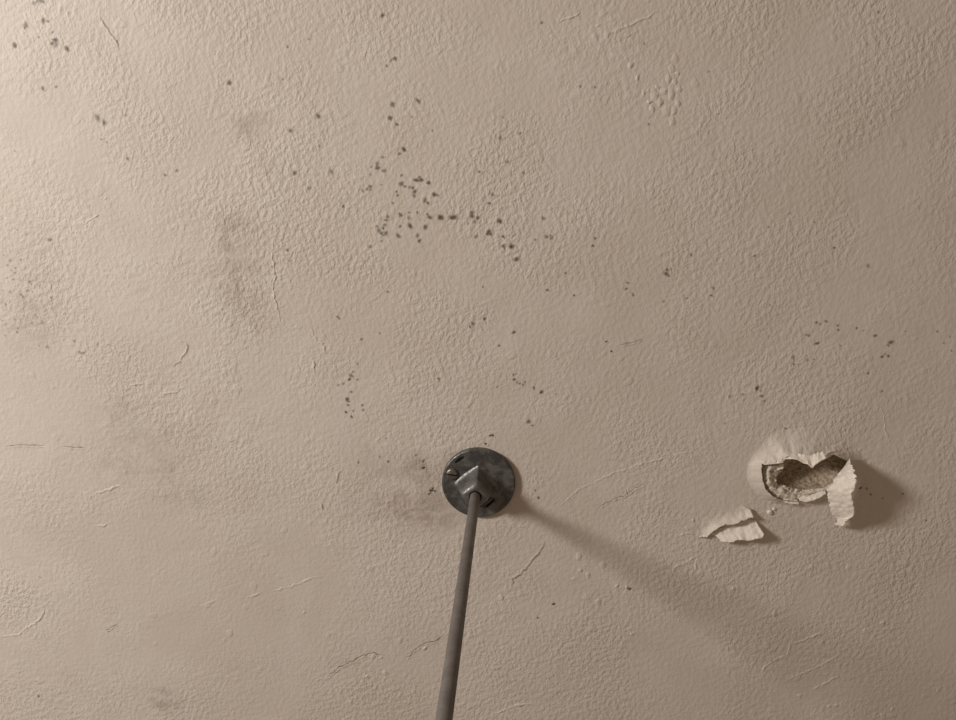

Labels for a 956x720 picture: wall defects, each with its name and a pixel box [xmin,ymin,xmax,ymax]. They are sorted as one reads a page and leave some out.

peeling [695,505,764,543]
spalling [747,427,867,526]